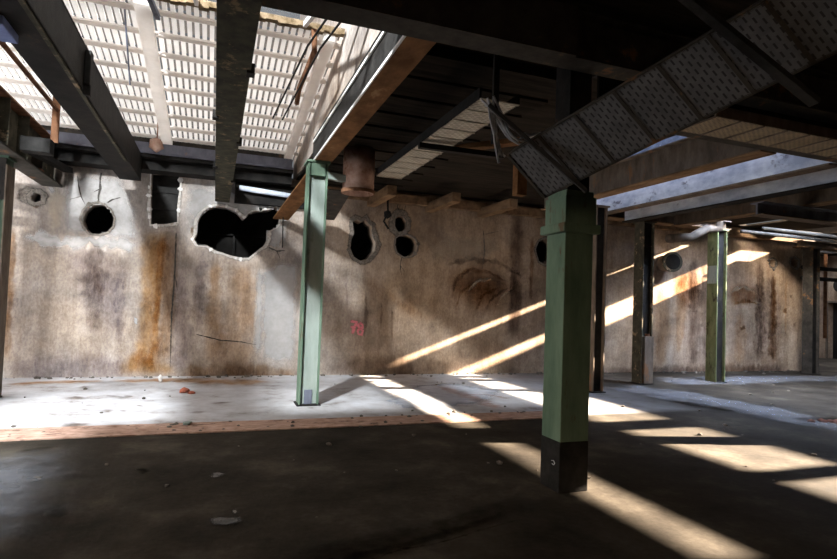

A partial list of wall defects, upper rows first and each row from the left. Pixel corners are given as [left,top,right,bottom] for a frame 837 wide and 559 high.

peeling [31,178,132,249]
spalling [146,174,282,262]
hole [346,214,382,265]
spalling [534,236,547,267]